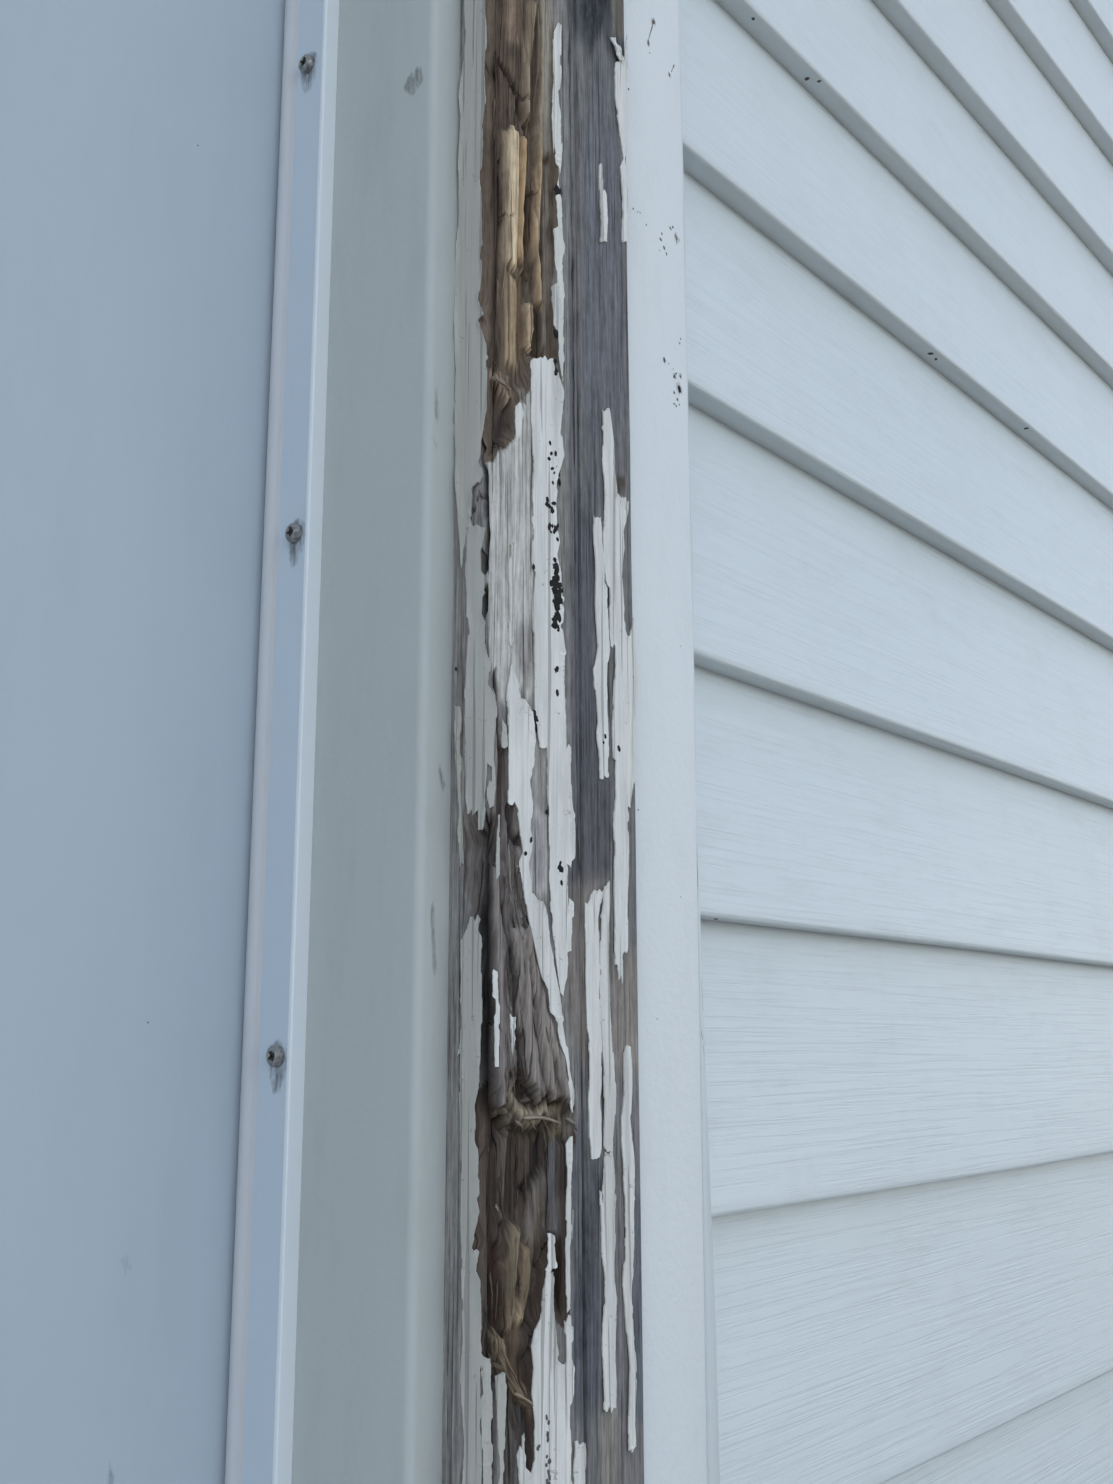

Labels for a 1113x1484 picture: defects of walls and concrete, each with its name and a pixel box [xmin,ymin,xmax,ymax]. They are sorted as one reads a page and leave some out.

peeling [453,0,638,1484]